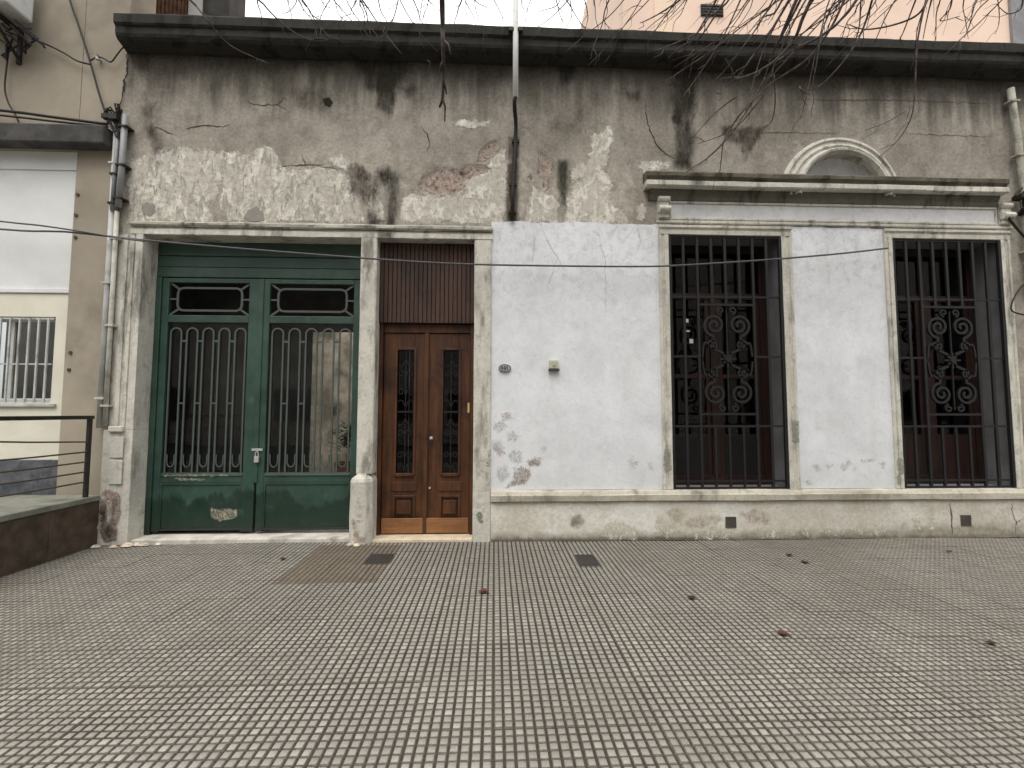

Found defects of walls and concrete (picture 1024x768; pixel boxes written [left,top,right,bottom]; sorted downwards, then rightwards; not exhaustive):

leakage [359,60,408,112]
peeling [125,146,385,224]
leakage [352,165,396,237]
peeling [399,141,509,226]
peeling [454,119,490,130]
peeling [525,125,647,224]
peeling [637,160,671,174]
leakage [648,70,1000,207]
peeling [484,439,539,487]
flaking render [98,490,121,543]